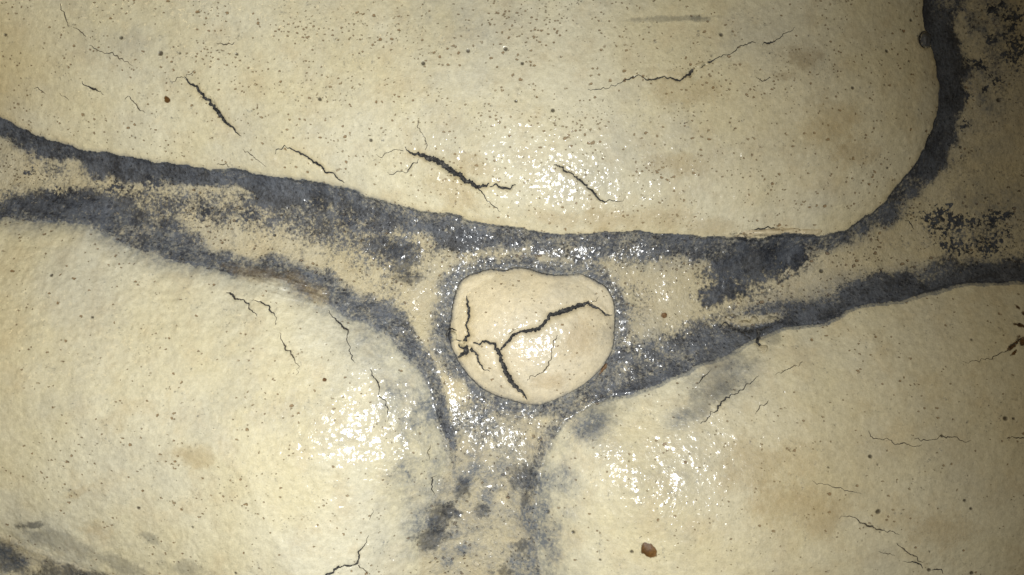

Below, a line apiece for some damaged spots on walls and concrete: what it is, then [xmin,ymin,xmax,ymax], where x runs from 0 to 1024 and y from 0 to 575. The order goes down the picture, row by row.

crack [588,28,794,90]
leakage [962,58,1005,103]
crack [173,72,344,183]
leakage [44,175,164,212]
crack [378,120,516,212]
crack [554,164,621,203]
leakage [905,203,1016,259]
leakage [697,234,818,309]
crack [226,292,299,373]
crack [457,296,612,400]
crack [325,509,373,575]
corrosion [641,542,657,558]